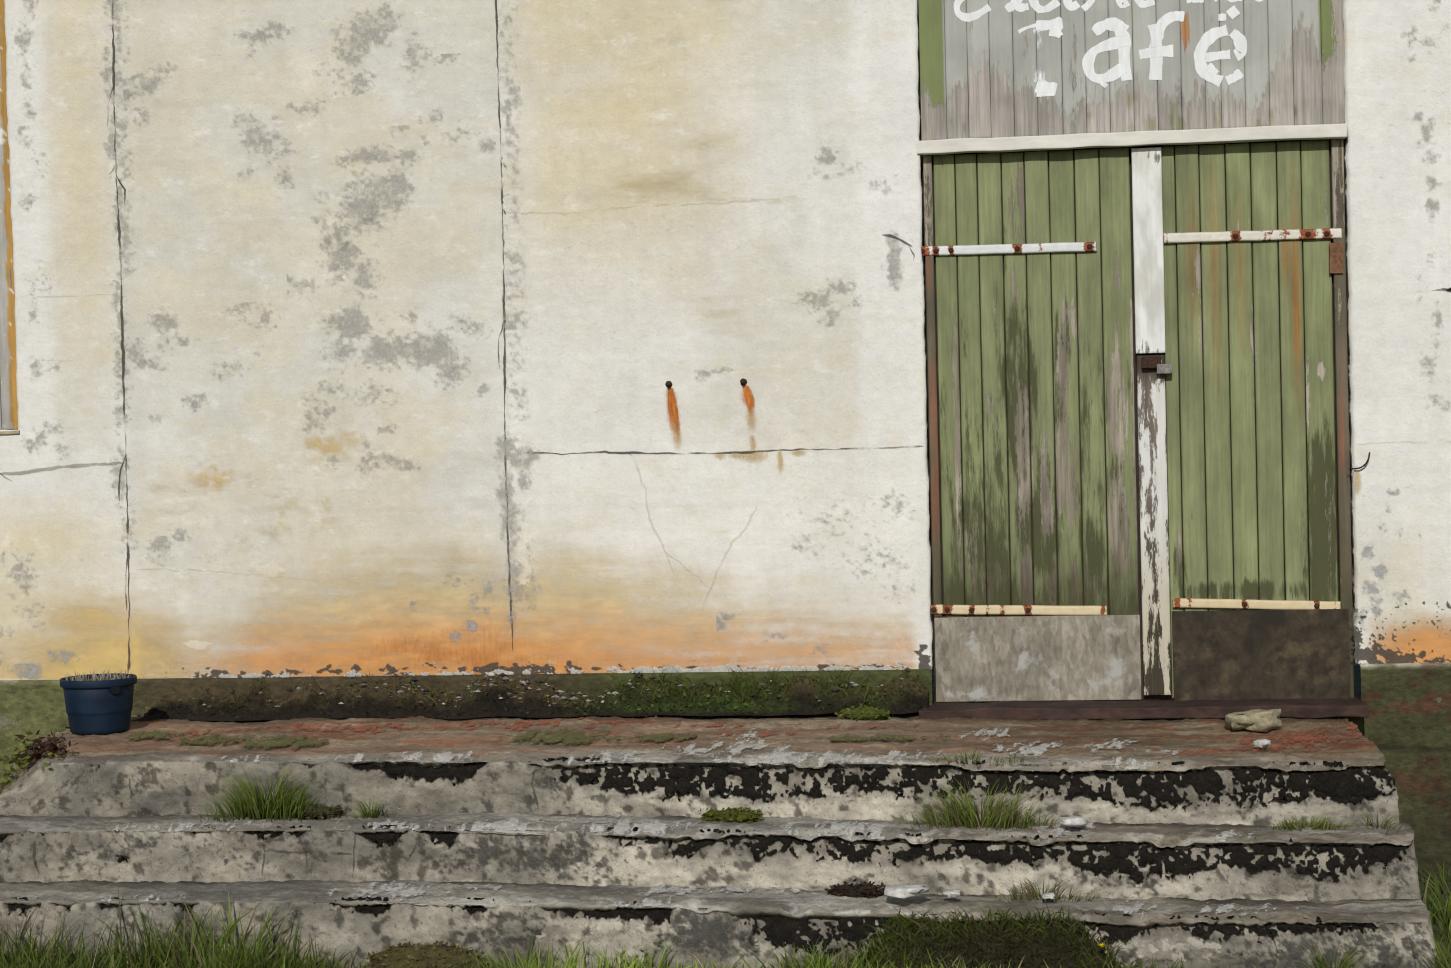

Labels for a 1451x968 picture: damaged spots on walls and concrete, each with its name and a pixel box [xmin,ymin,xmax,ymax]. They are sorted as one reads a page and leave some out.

peeling [328,148,414,287]
peeling [328,309,478,380]
crack [495,0,850,650]
corrosion [668,388,679,440]
corrosion [743,385,754,418]
water stain [1,568,908,679]
flaking render [1348,547,1451,664]
peeling [112,821,311,840]
spalling [335,721,1408,968]
spalling [6,897,70,916]
spalling [99,894,193,912]
peeling [329,881,502,916]